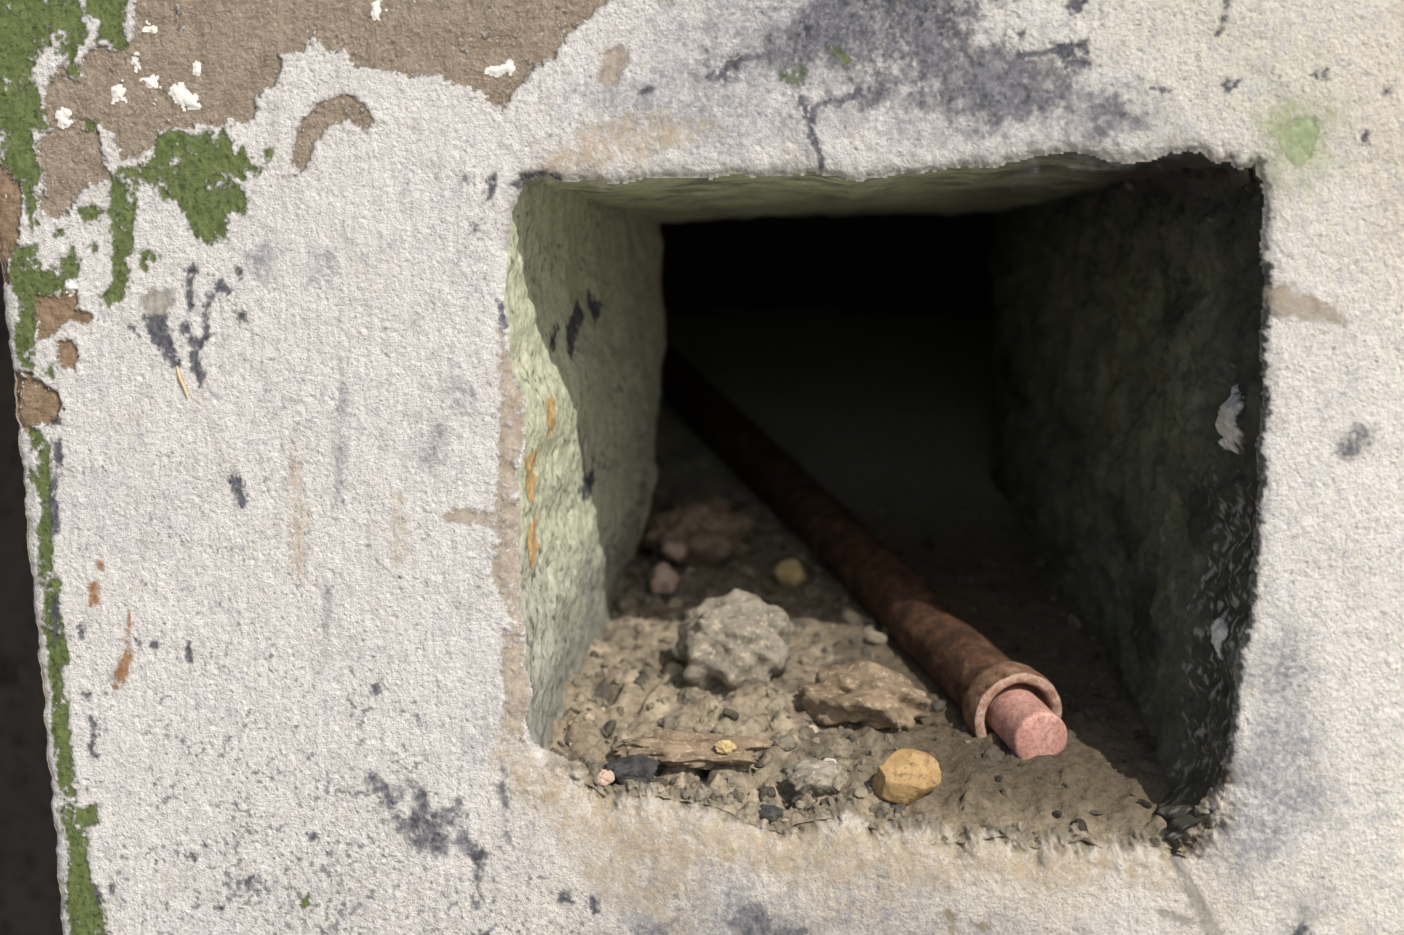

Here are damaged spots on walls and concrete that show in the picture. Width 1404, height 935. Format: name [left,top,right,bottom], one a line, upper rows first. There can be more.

spalling [599,46,631,88]
damp [690,0,1142,138]
spalling [0,0,607,935]
crack [1158,850,1224,935]